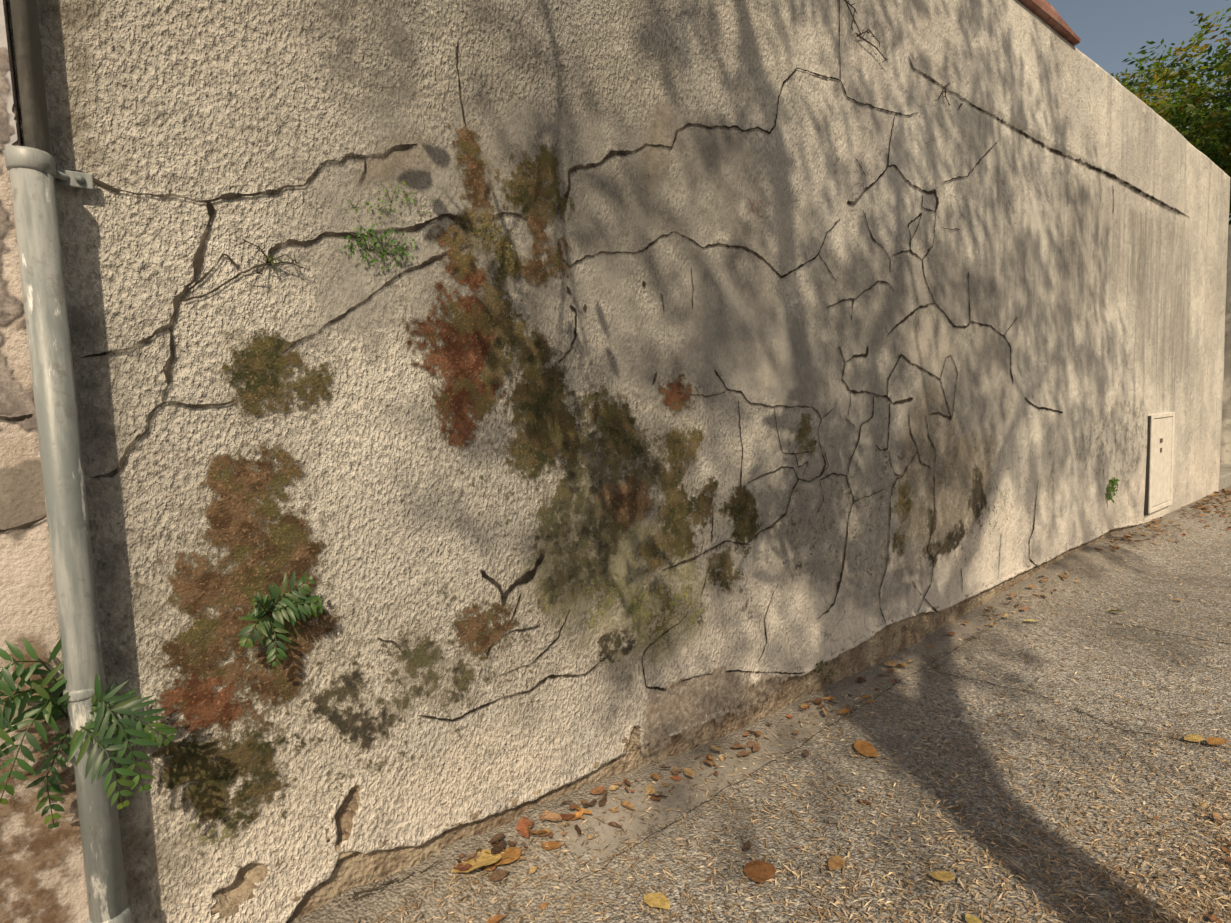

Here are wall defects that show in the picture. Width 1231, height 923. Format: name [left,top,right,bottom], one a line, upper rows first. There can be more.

spalling [0,47,14,150]
crack [0,414,33,422]
spalling [0,206,38,432]
crack [0,516,47,532]
water stain [448,442,549,564]
water stain [324,106,771,413]
crack [69,0,1189,691]
water stain [761,248,1008,606]
crack [418,553,606,721]